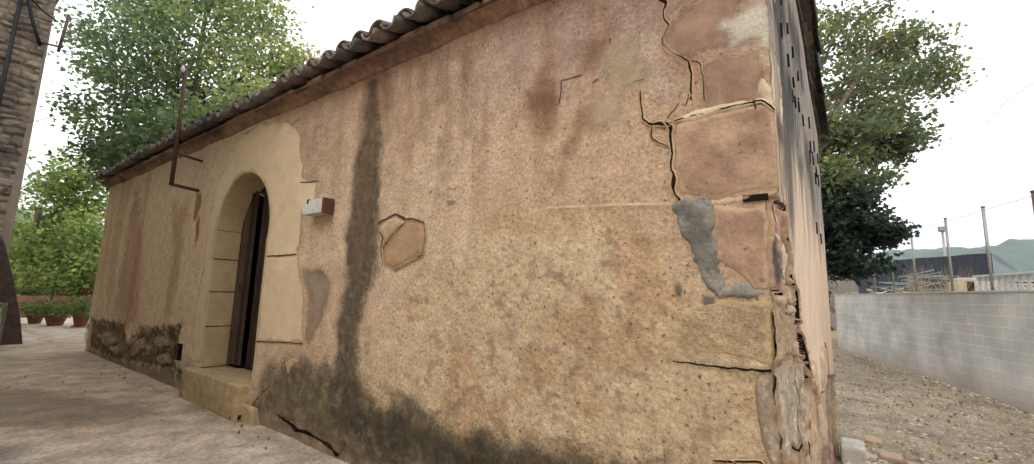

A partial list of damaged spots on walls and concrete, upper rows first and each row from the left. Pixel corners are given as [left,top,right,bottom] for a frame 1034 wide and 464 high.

spalling [376,212,426,272]
damp [256,80,597,464]
crack [559,0,830,459]
peeling [766,194,788,283]
spalling [85,316,182,380]
spalling [769,284,839,464]
crack [713,456,765,464]